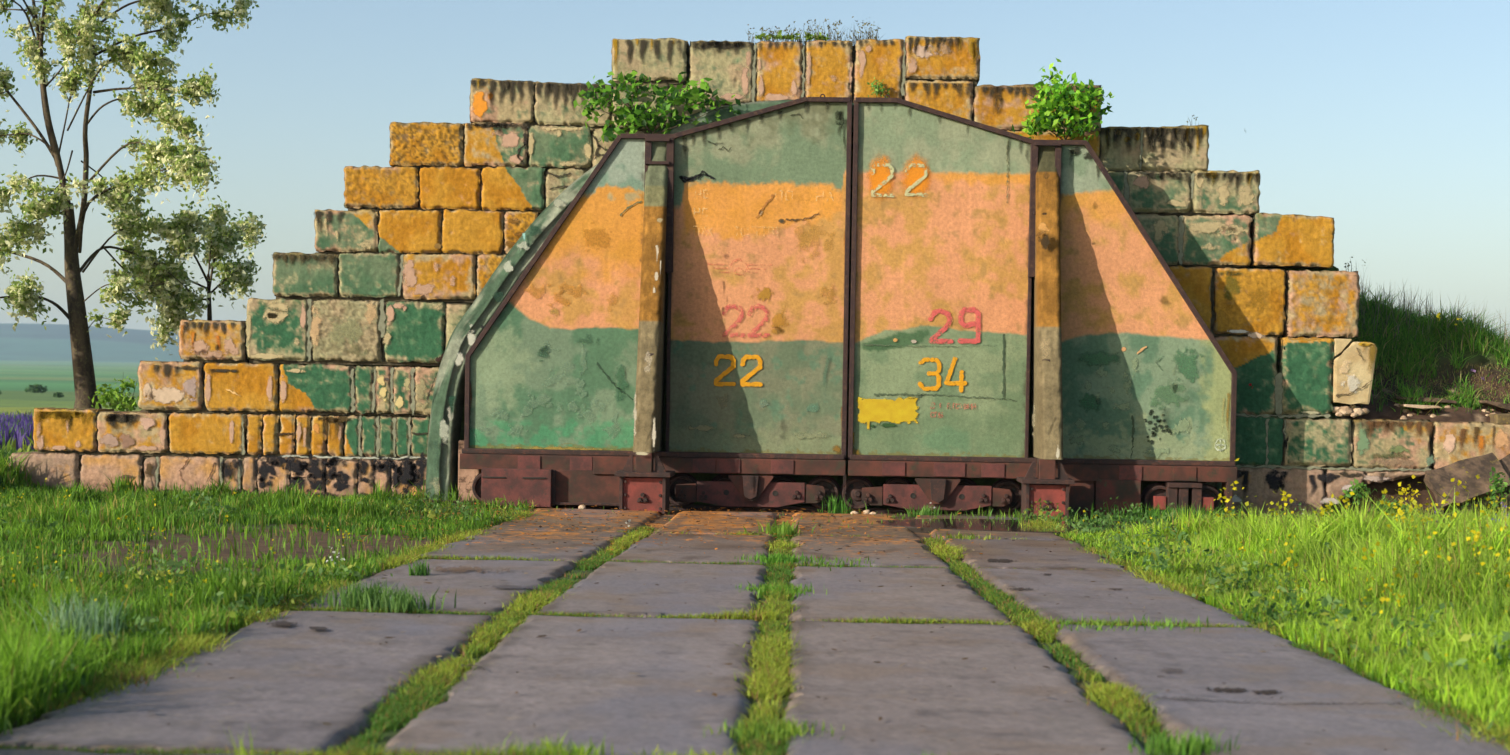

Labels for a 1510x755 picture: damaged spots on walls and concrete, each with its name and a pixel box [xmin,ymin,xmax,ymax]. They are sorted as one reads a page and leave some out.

damp [612,37,976,64]
damp [471,79,606,109]
damp [908,83,1099,115]
damp [466,122,529,132]
damp [1105,126,1207,153]
damp [1070,147,1099,177]
damp [1147,171,1260,188]
damp [220,441,440,498]